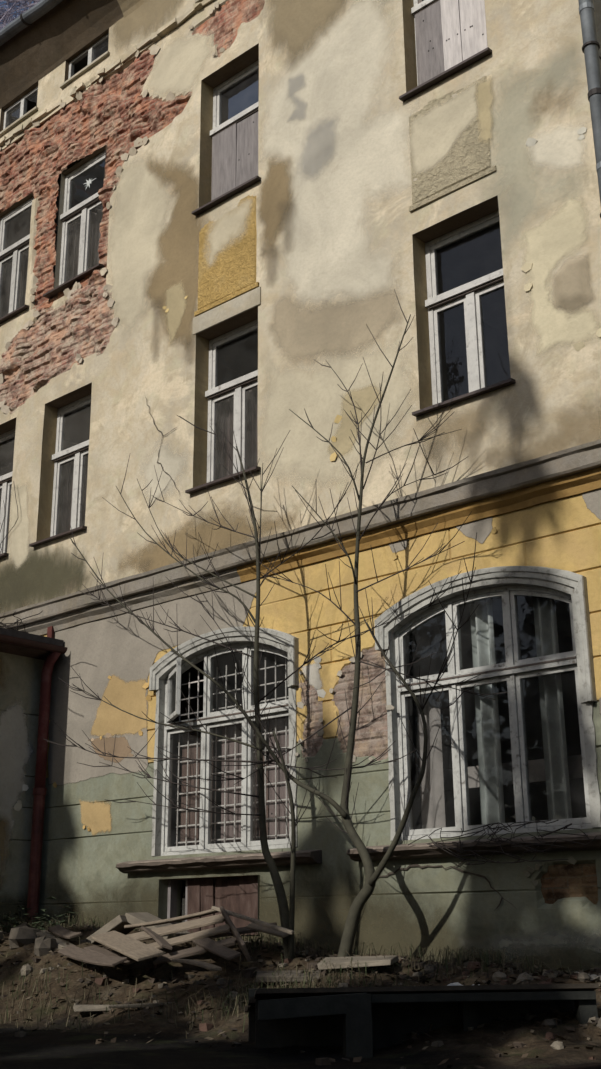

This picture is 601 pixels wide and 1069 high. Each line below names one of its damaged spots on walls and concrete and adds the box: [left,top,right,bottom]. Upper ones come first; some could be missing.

spalling [189,0,265,57]
spalling [0,45,192,414]
leakage [147,164,202,346]
leakage [0,485,87,614]
peeling [582,489,601,520]
peeling [48,579,256,788]
spalling [295,646,395,762]
peeling [0,705,32,875]
peeling [80,801,111,835]
spalling [523,856,598,905]